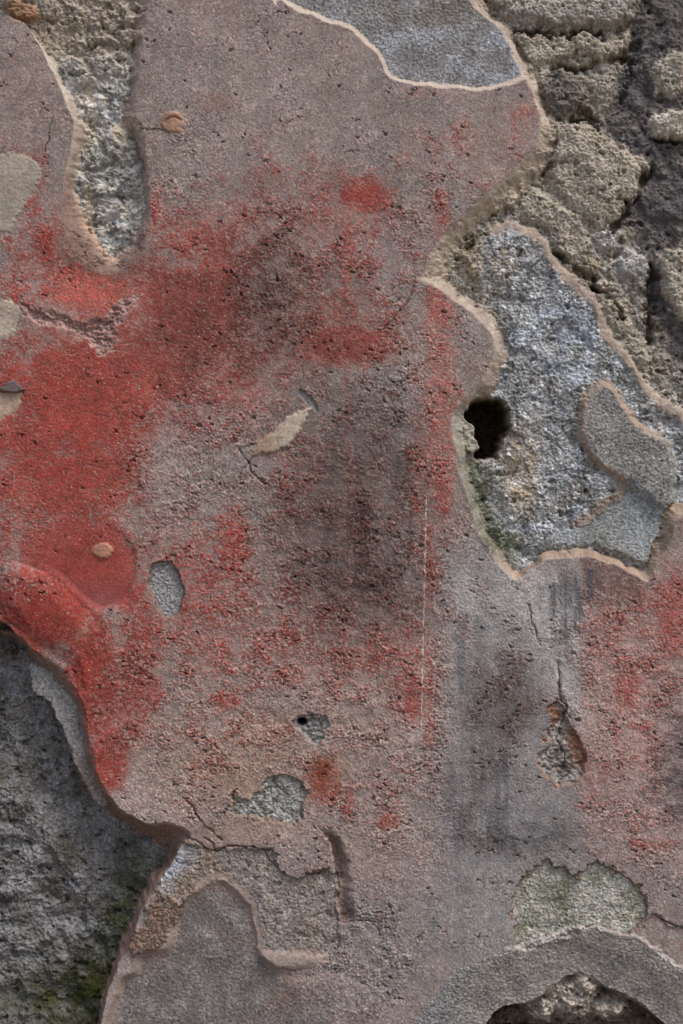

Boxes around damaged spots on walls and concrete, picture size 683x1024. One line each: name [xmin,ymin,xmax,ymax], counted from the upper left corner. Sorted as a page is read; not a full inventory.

spalling [0,0,153,277]
spalling [272,0,683,583]
peeling [18,516,186,620]
spalling [536,698,588,790]
spalling [0,606,392,1024]
crack [187,801,277,866]
spalling [504,858,683,974]
spalling [486,972,665,1024]